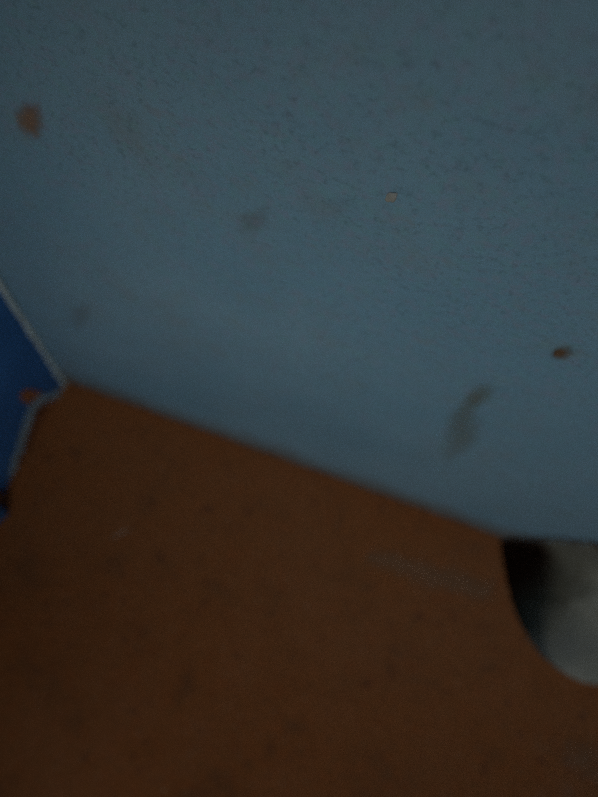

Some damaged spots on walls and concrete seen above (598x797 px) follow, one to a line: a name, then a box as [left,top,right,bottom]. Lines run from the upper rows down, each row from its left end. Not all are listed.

spalling [500,536,598,685]